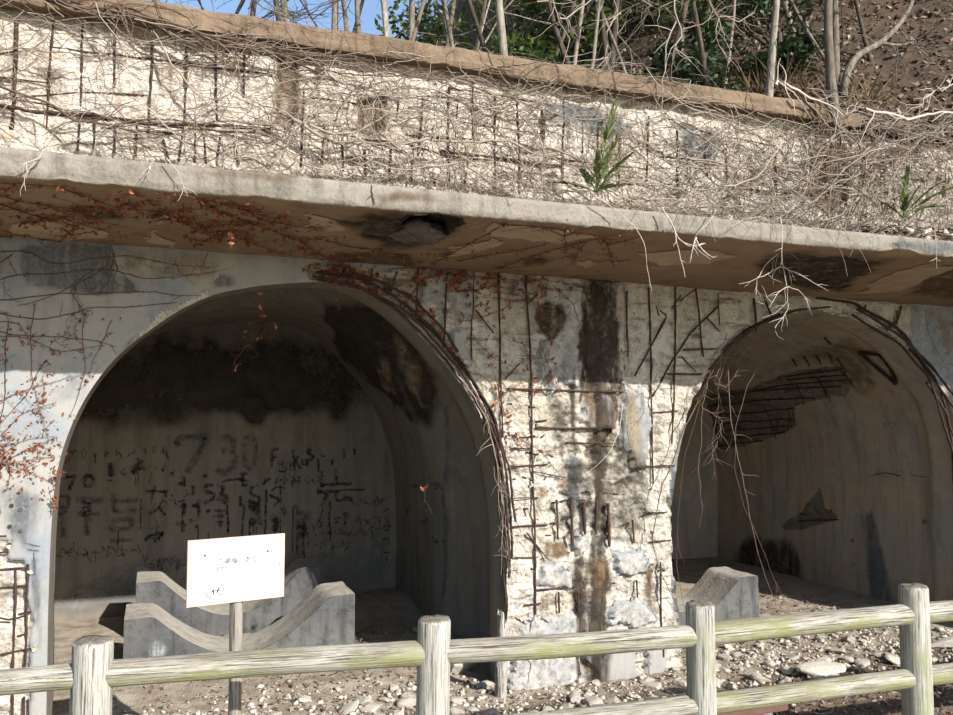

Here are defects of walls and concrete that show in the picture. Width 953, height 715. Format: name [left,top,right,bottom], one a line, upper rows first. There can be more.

spalling [0,9,274,165]
spalling [300,59,953,223]
peeling [303,213,345,232]
peeling [394,213,599,259]
peeling [632,249,737,268]
damp [547,279,622,632]
spalling [307,260,953,636]
spalling [0,535,38,669]
spalling [0,693,30,715]
damp [576,655,608,683]
peeling [507,648,687,712]